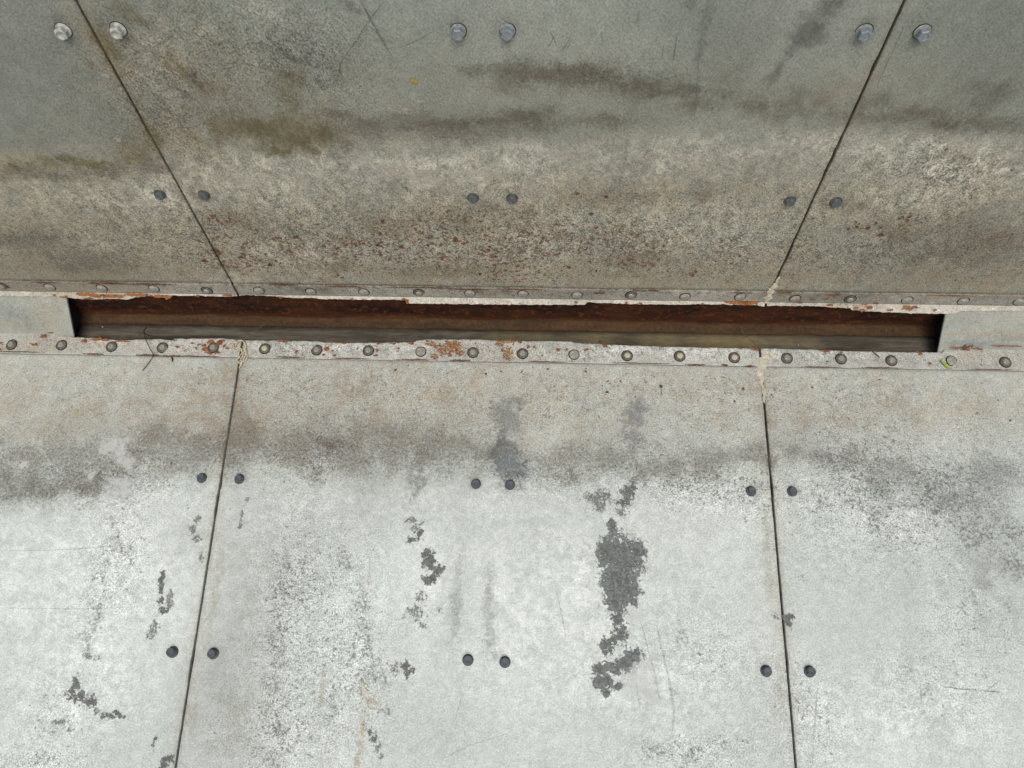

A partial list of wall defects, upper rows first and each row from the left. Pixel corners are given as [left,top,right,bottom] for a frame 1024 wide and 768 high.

corrosion [325,200,506,269]
corrosion [201,236,300,299]
corrosion [386,287,487,304]
corrosion [725,292,759,306]
corrosion [81,337,131,355]
corrosion [136,339,229,357]
damp [85,438,135,500]
damp [489,435,527,481]
peeling [405,516,445,629]
peeling [586,481,649,699]